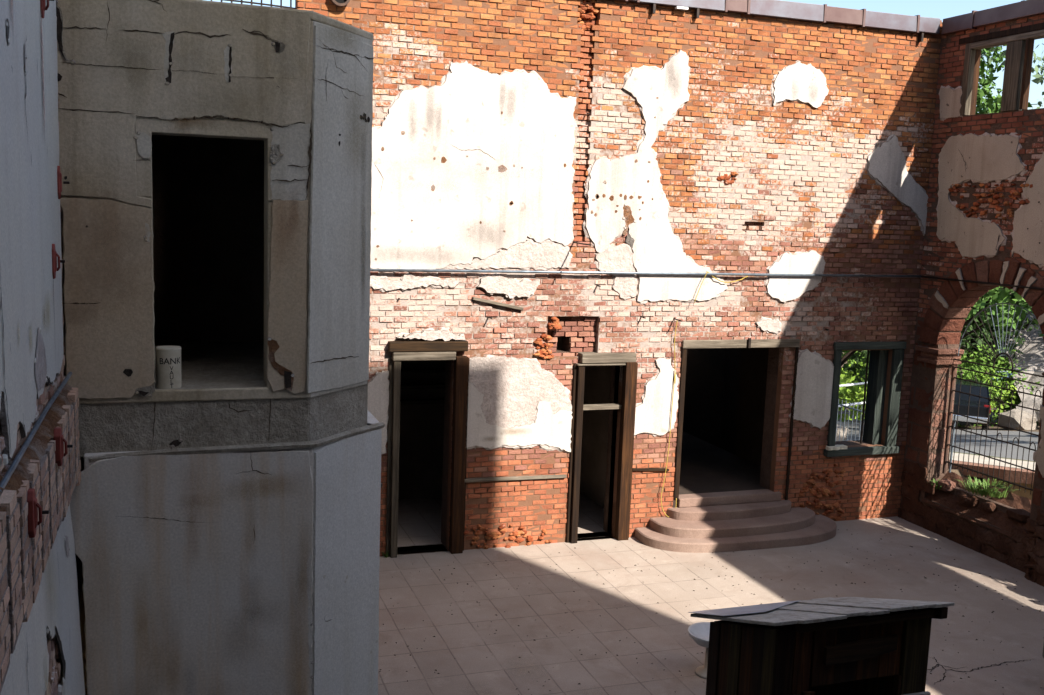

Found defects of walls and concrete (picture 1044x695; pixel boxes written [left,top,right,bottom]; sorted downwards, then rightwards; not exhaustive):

crack [67,0,277,41]
spalling [574,0,599,31]
crack [318,39,374,101]
flaking render [770,60,829,109]
crack [58,93,312,200]
spalling [716,172,738,184]
spalling [948,183,1040,220]
flaking render [764,249,826,303]
flaking render [755,317,782,336]
spalling [464,524,552,549]
spalling [45,626,66,695]
crack [927,658,1031,683]